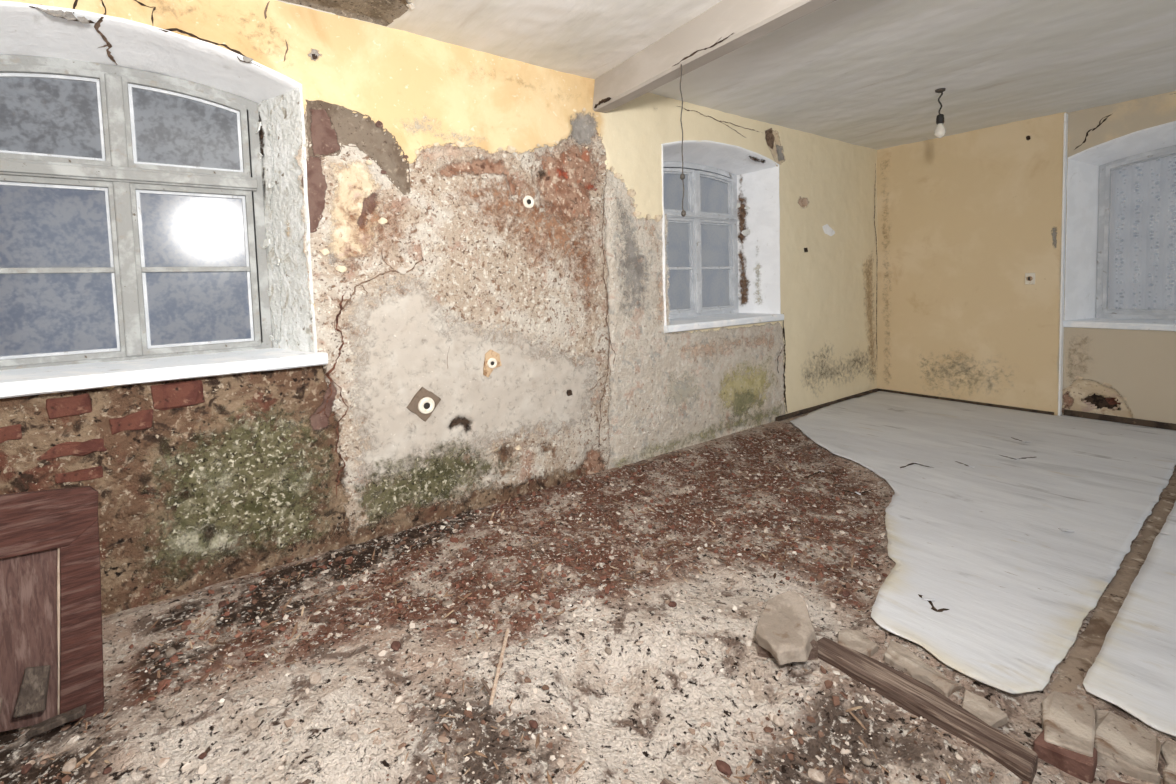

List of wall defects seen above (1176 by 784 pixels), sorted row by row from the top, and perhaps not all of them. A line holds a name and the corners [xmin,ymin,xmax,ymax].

crack [29,0,117,65]
crack [135,0,288,68]
crack [310,251,424,497]
flaking render [0,100,786,617]
damp [719,359,774,416]
spalling [1062,375,1133,418]
damp [417,462,455,497]